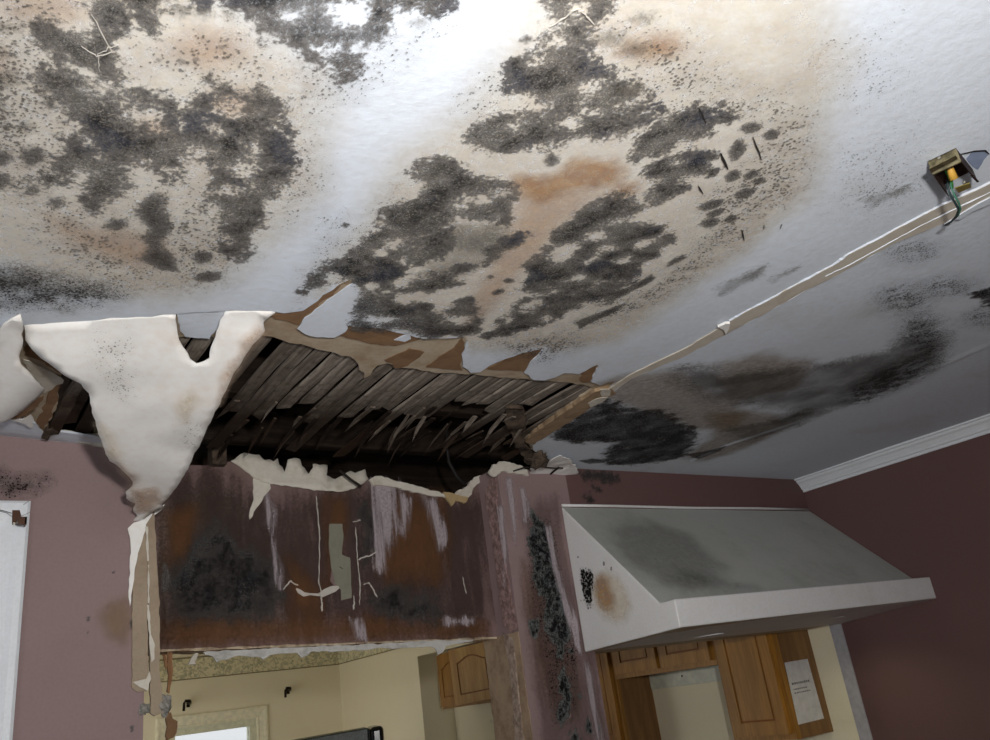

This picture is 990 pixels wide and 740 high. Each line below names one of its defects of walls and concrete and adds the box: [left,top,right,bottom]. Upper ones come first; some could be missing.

water stain [0,0,822,364]
spalling [190,444,208,465]
peeling [297,283,358,338]
spalling [525,385,616,445]
mould [551,399,726,503]
water stain [679,273,990,437]
spalling [131,512,172,718]
water stain [158,495,286,624]
spalling [203,445,533,740]
efflorescence [355,485,412,574]
efflorescence [425,497,448,549]
water stain [497,477,602,740]